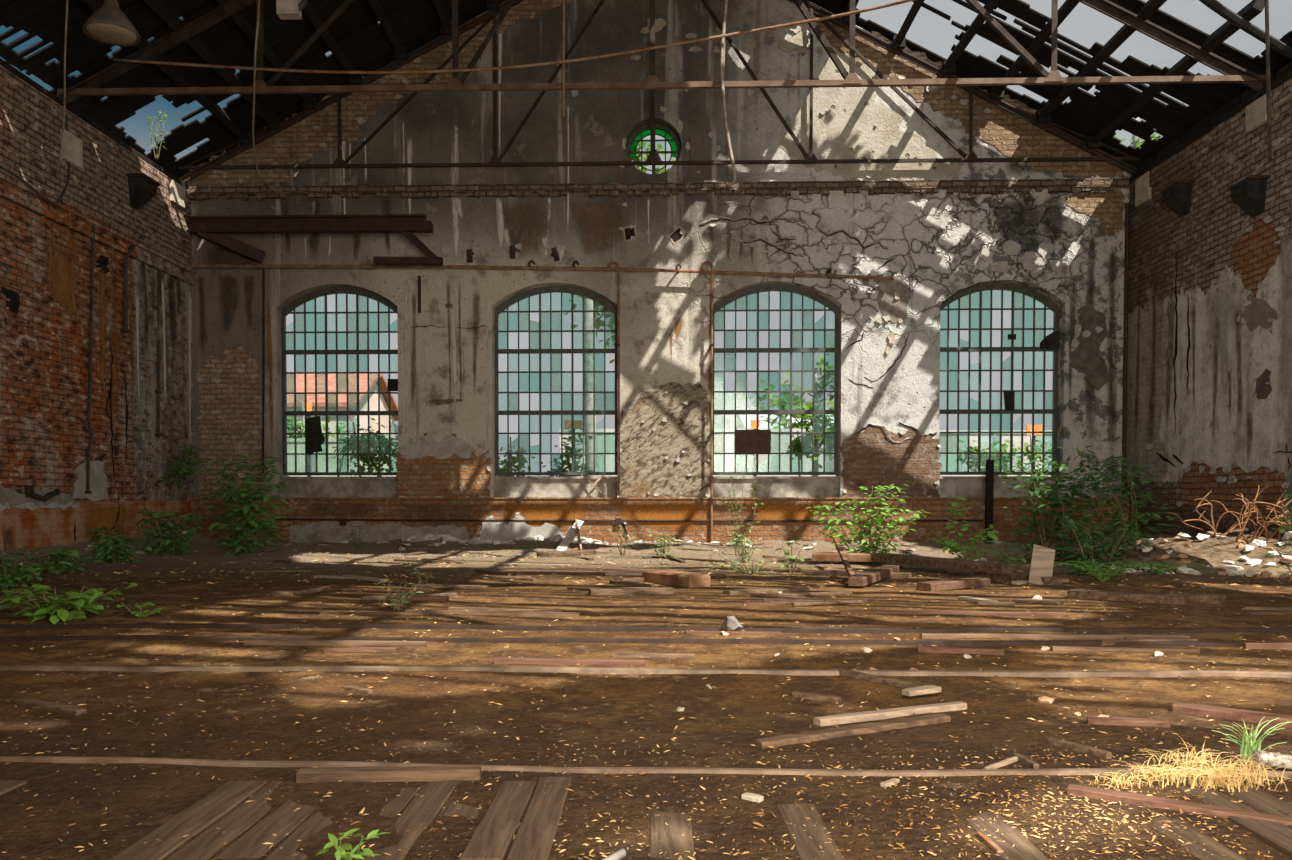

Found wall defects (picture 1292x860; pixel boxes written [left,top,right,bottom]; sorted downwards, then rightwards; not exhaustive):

spalling [0,286,23,312]
spalling [95,255,110,275]
spalling [1225,215,1287,337]
crack [847,331,909,388]
water stain [1069,242,1115,434]
water stain [1135,285,1173,419]
spalling [0,460,110,511]
spalling [395,445,493,497]
spalling [616,381,714,497]
spalling [840,422,942,497]